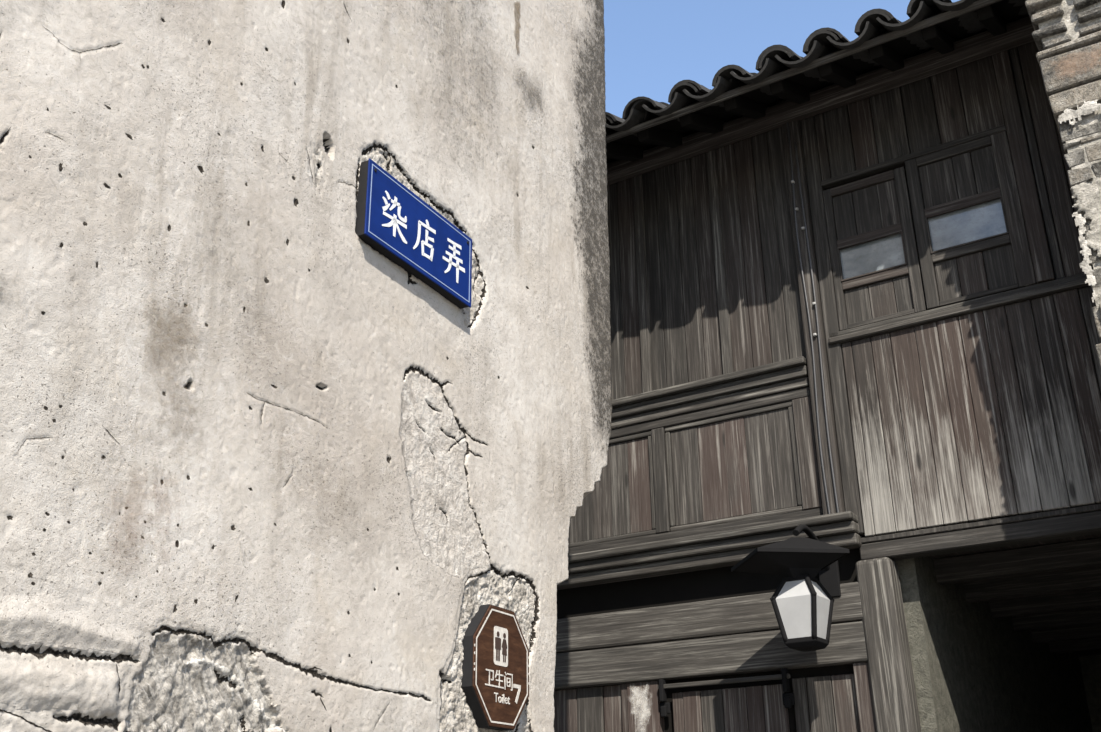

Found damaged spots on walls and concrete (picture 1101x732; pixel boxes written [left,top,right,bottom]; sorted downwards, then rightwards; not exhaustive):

spalling [362,148,458,228]
water stain [570,0,612,462]
spalling [462,251,483,327]
flaking render [387,372,535,732]
crack [0,643,140,732]
spalling [124,626,287,732]
crack [251,646,452,732]